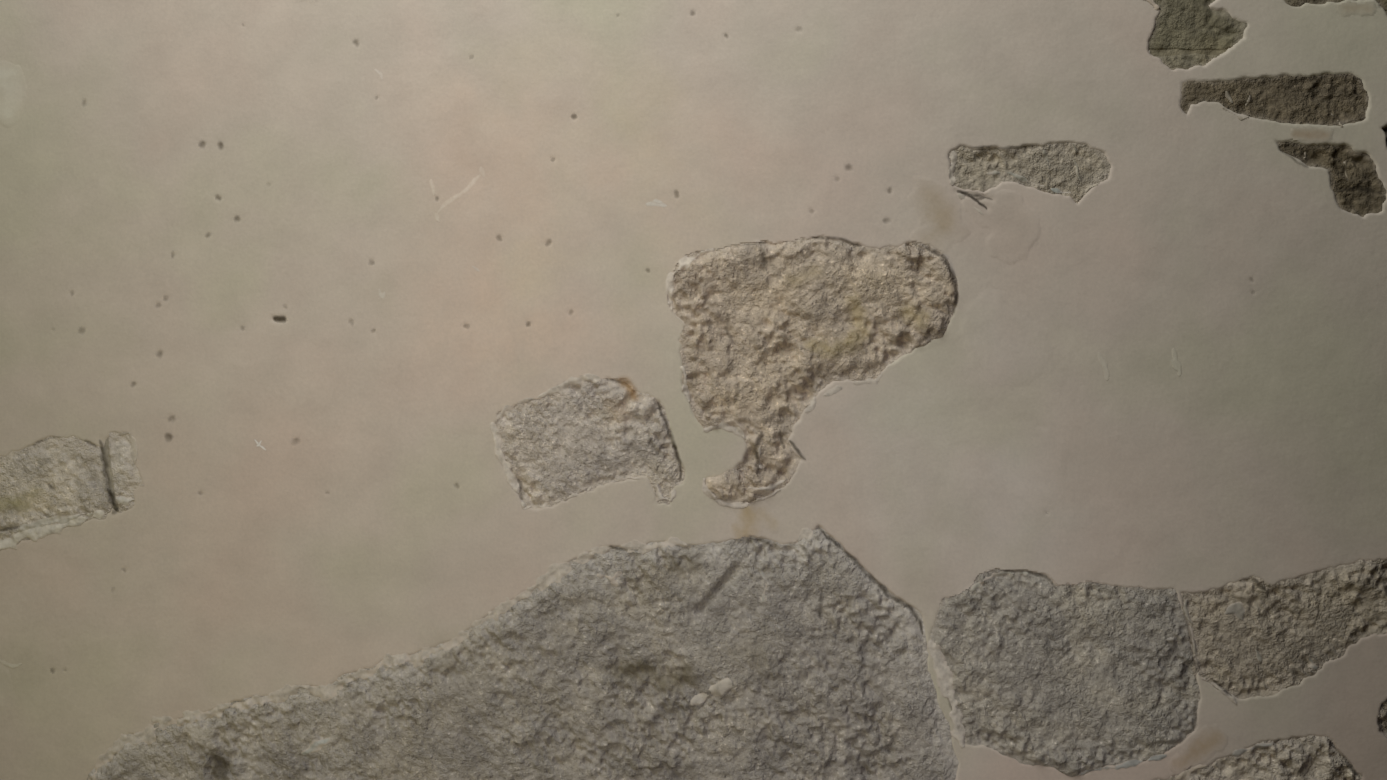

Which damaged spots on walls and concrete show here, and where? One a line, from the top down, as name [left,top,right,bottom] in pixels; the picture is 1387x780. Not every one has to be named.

flaking render [1146,0,1369,127]
flaking render [948,142,1111,215]
flaking render [1276,142,1387,217]
flaking render [665,236,958,509]
flaking render [0,432,144,550]
flaking render [490,373,685,509]
flaking render [87,526,1387,780]